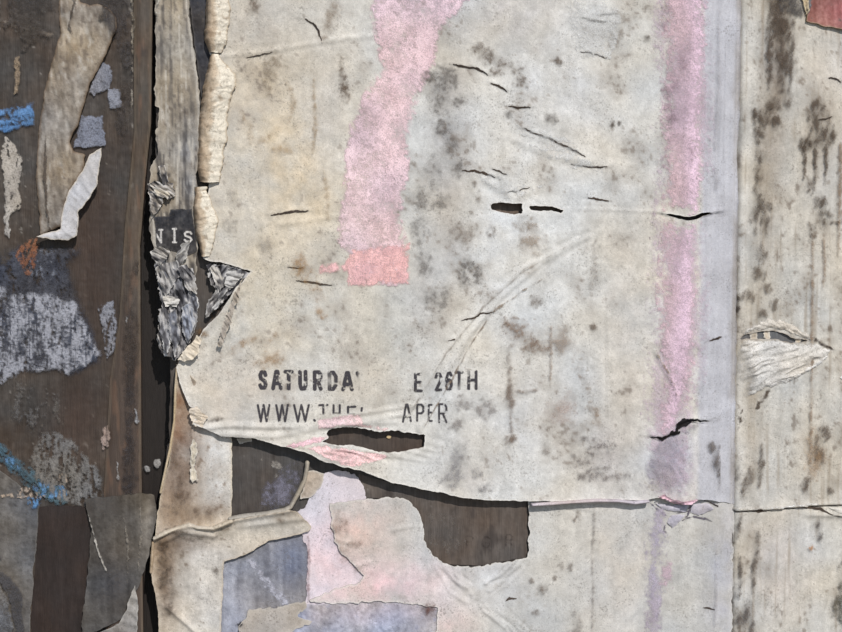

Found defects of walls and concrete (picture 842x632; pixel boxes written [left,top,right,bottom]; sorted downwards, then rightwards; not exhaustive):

water stain [754,0,802,143]
water stain [754,174,772,231]
water stain [800,99,842,229]
peeling [150,241,249,494]
peeling [150,437,650,574]